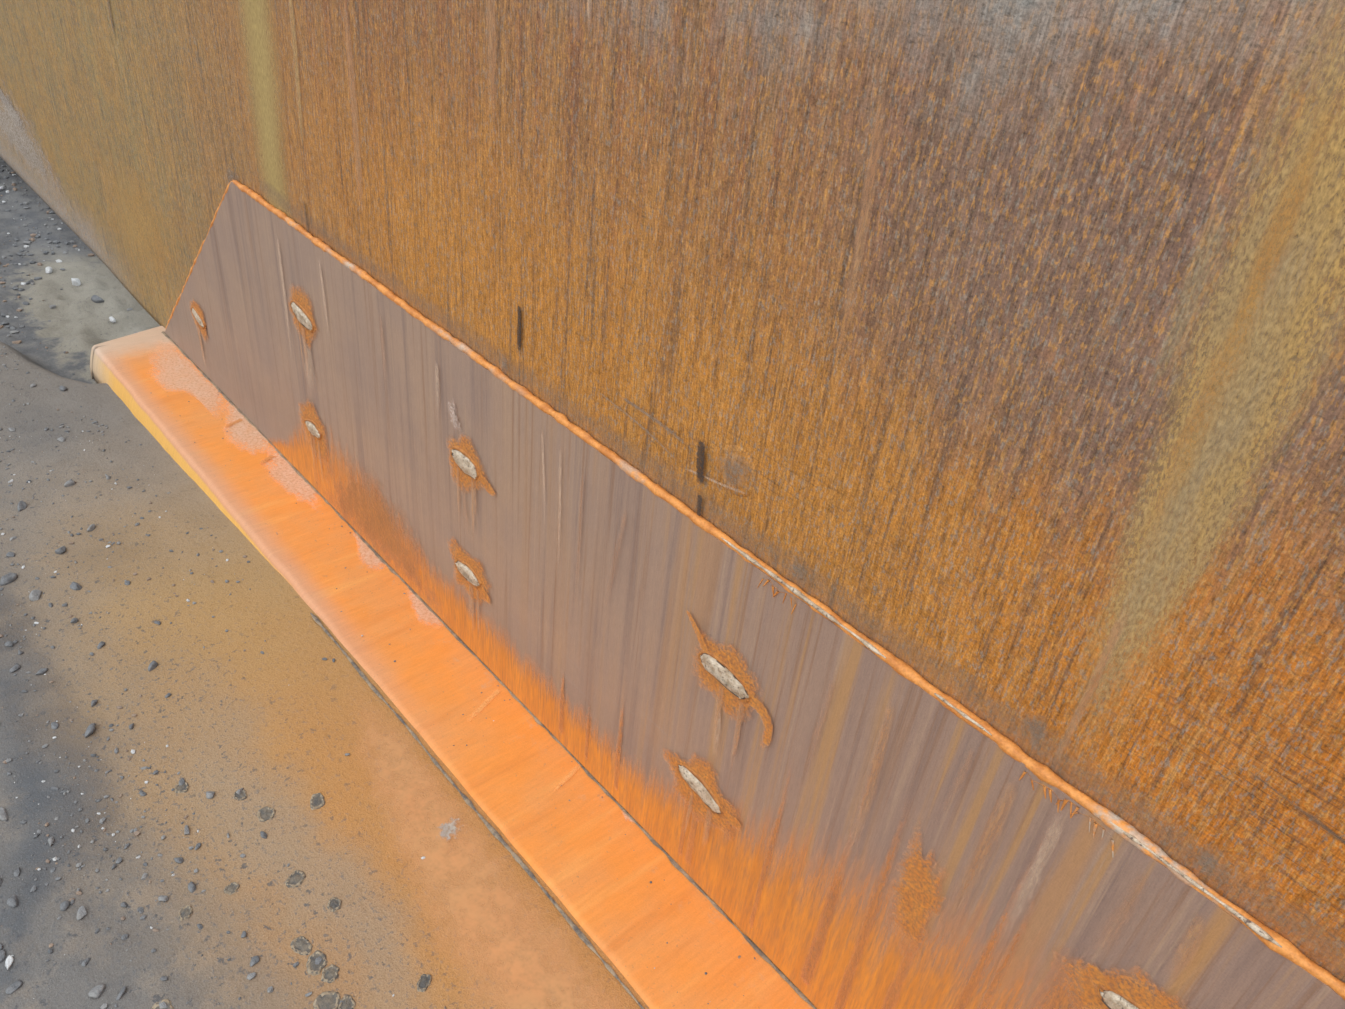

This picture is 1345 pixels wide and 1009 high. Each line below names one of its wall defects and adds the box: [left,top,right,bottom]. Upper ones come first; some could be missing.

corrosion [190,301,207,349]
corrosion [288,287,316,352]
corrosion [1060,42,1345,750]
corrosion [272,402,1024,1009]
corrosion [1062,960,1182,1009]